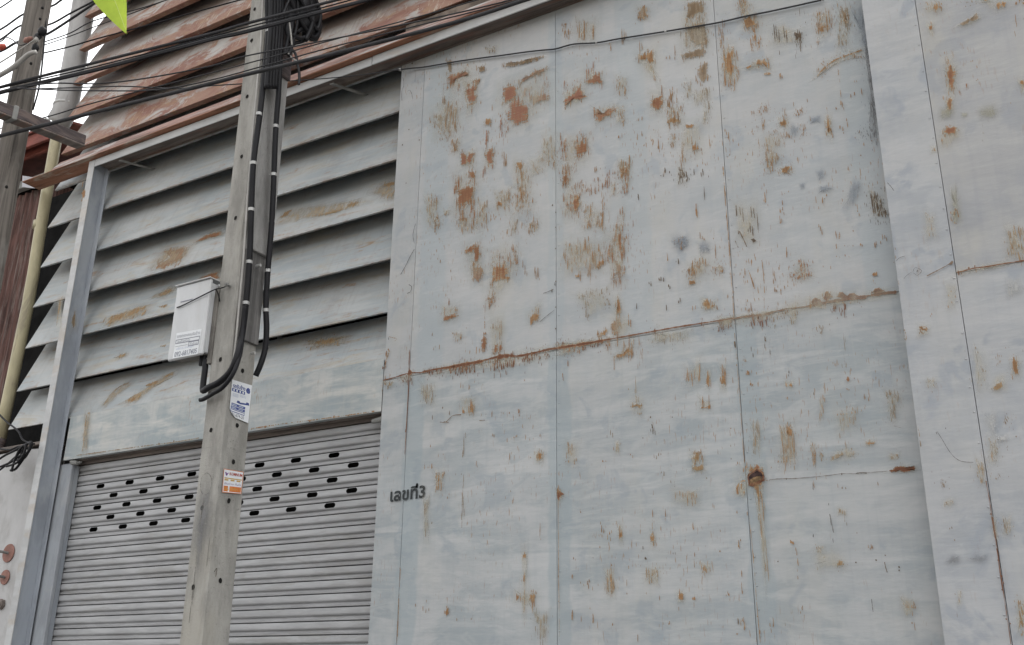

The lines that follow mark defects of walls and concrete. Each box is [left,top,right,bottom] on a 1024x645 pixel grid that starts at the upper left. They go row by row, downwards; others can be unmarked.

rust [503,55,544,67]
rust [429,96,463,151]
rust [957,225,1024,275]
rust [382,134,899,645]